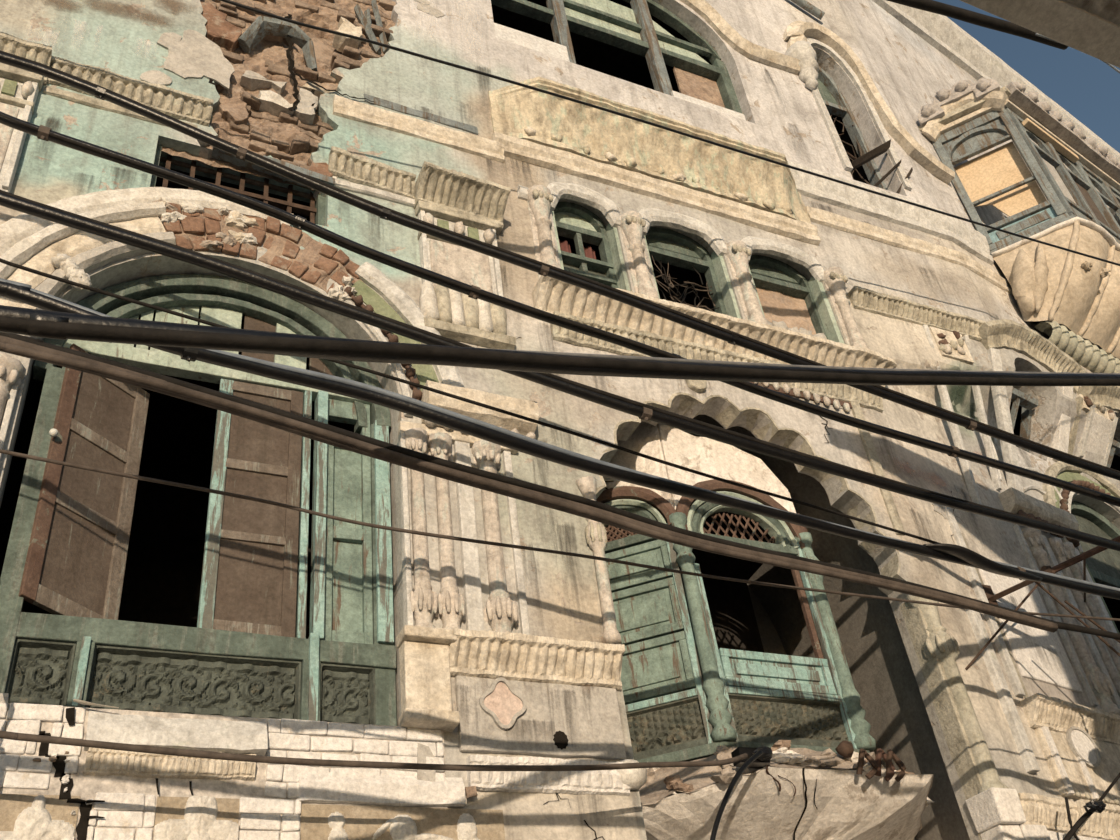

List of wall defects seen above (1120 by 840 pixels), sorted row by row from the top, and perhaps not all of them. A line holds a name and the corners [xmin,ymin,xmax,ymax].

spalling [140,0,396,200]
crack [284,14,374,111]
flaking render [151,186,372,302]
crack [32,707,105,840]
crack [543,793,605,840]